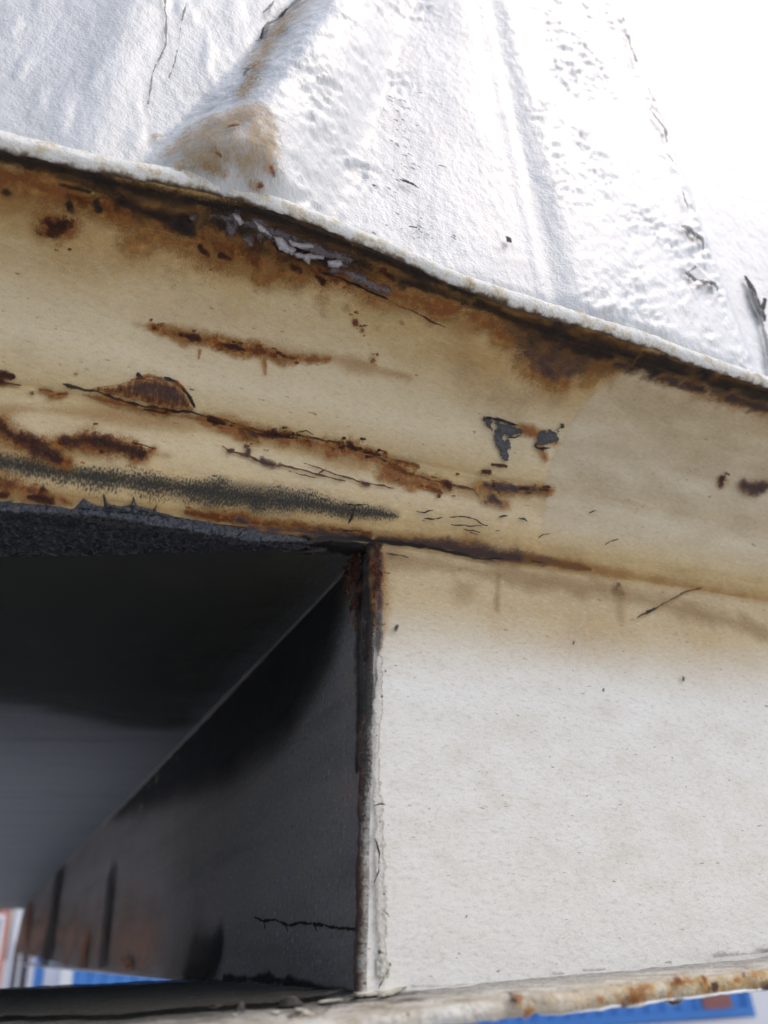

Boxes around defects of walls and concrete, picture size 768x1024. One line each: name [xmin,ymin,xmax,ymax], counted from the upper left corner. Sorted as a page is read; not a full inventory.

corrosion [152,102,281,192]
peeling [233,213,343,268]
corrosion [0,151,768,413]
corrosion [0,416,157,470]
spalling [483,416,565,462]
corrosion [0,472,71,506]
corrosion [719,472,768,497]
crack [637,587,703,618]
corrosion [184,506,390,822]
crack [254,916,355,932]
corrosion [596,982,651,1009]
corrosion [667,973,733,1009]